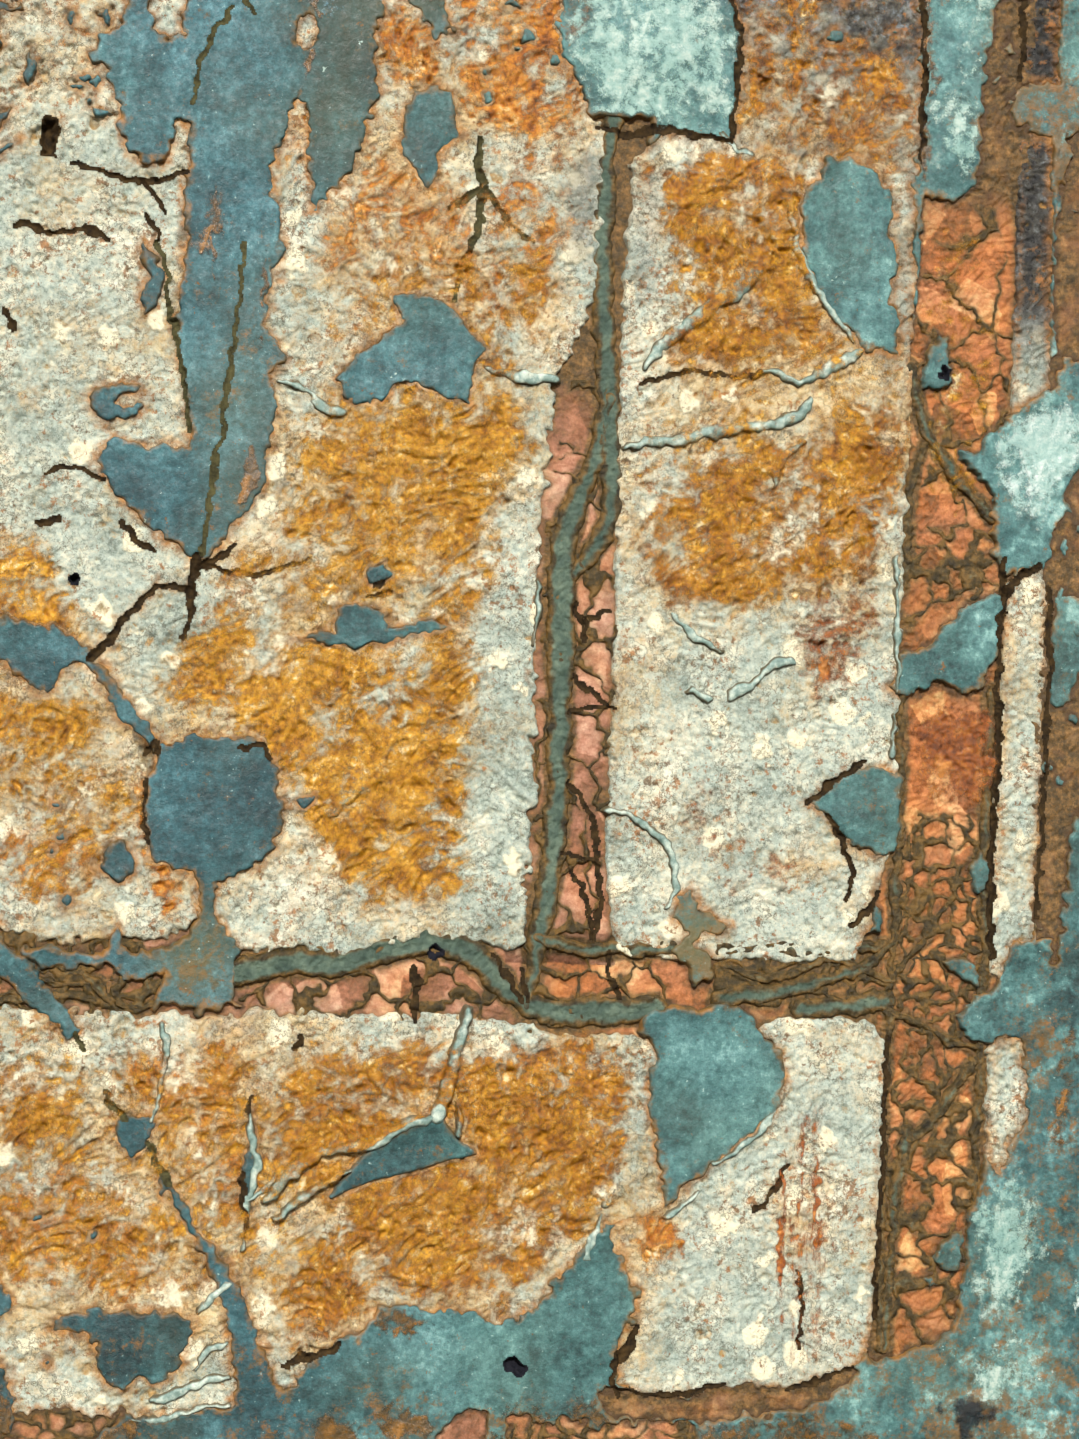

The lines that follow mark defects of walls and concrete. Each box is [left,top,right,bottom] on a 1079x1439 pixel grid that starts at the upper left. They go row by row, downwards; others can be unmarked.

crack [13,219,111,242]
crack [70,160,311,662]
peeling [0,0,605,985]
corrosion [156,0,593,909]
peeling [540,0,1079,1033]
corrosion [909,706,997,803]
peeling [0,955,977,1439]
crack [871,1035,891,1320]
peeling [978,1035,1029,1175]
corrosion [314,1414,358,1439]
crack [609,1324,727,1399]
corrosion [699,1413,879,1439]